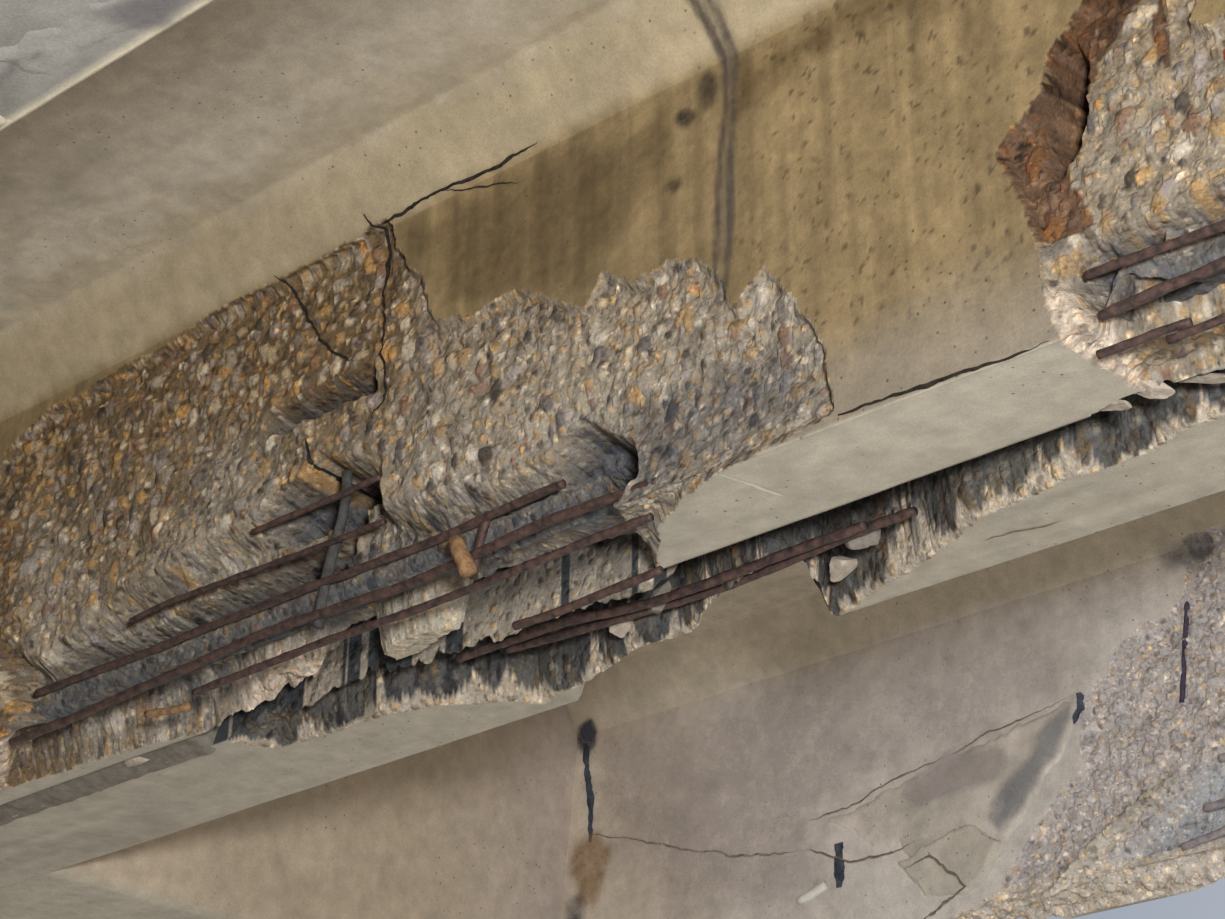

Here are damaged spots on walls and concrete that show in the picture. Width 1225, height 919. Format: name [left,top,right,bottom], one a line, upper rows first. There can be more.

peeling [0,0,182,75]
crack [275,142,538,422]
leakage [677,111,694,124]
leakage [691,0,735,278]
spalling [994,0,1225,389]
crack [305,438,383,503]
spalling [0,218,1225,790]
crack [592,834,914,863]
spalling [796,526,1225,919]